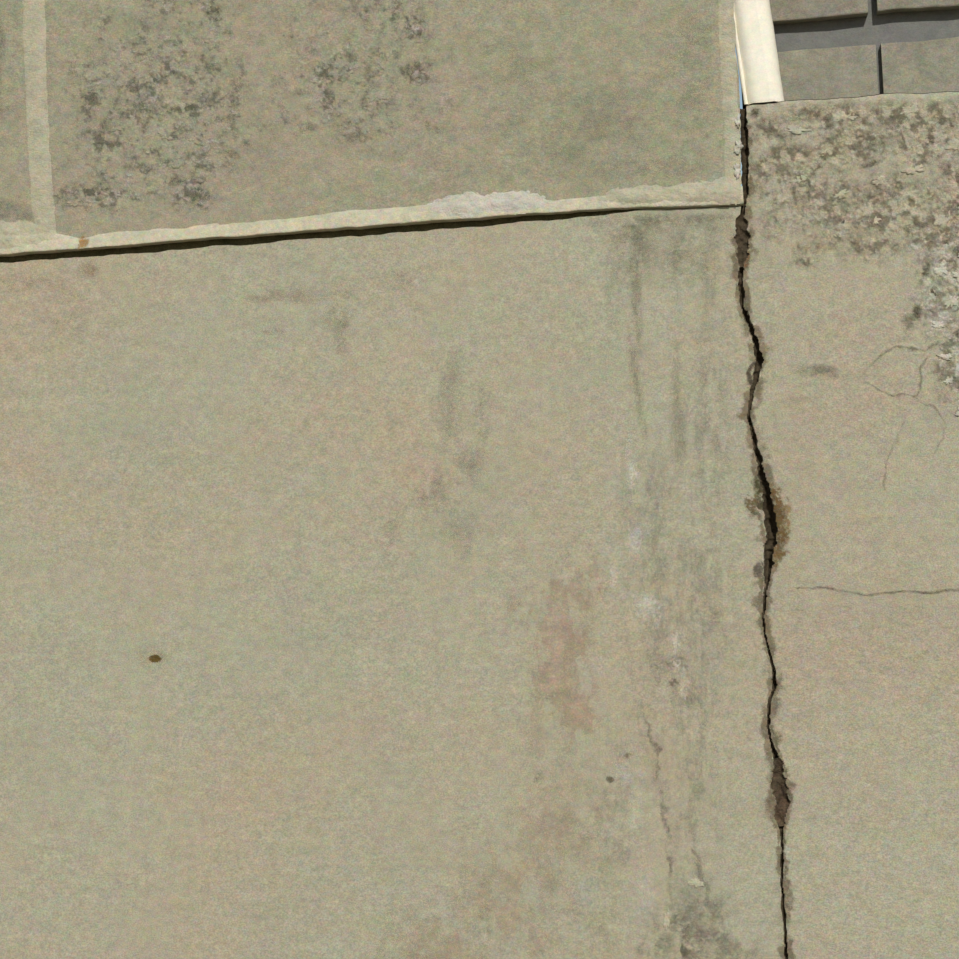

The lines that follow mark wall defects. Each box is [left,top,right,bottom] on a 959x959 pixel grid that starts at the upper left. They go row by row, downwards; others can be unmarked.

crack [731,109,795,959]
spalling [751,103,959,416]